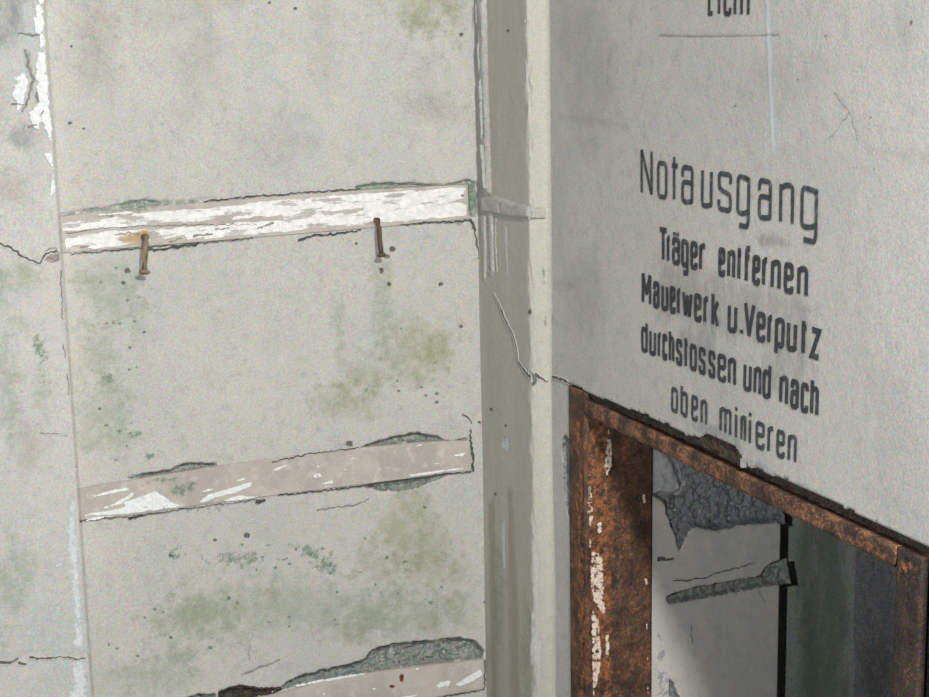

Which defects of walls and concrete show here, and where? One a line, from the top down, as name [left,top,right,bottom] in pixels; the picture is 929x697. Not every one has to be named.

peeling [12,0,56,206]
crack [0,222,274,320]
peeling [45,43,486,262]
crack [204,188,360,202]
crack [298,229,361,241]
crack [401,194,571,386]
flaking render [580,387,929,554]
peeling [56,463,217,697]
flaking render [189,638,484,697]
corrosion [575,418,615,697]
peeling [589,541,610,696]
flaking render [667,558,791,604]